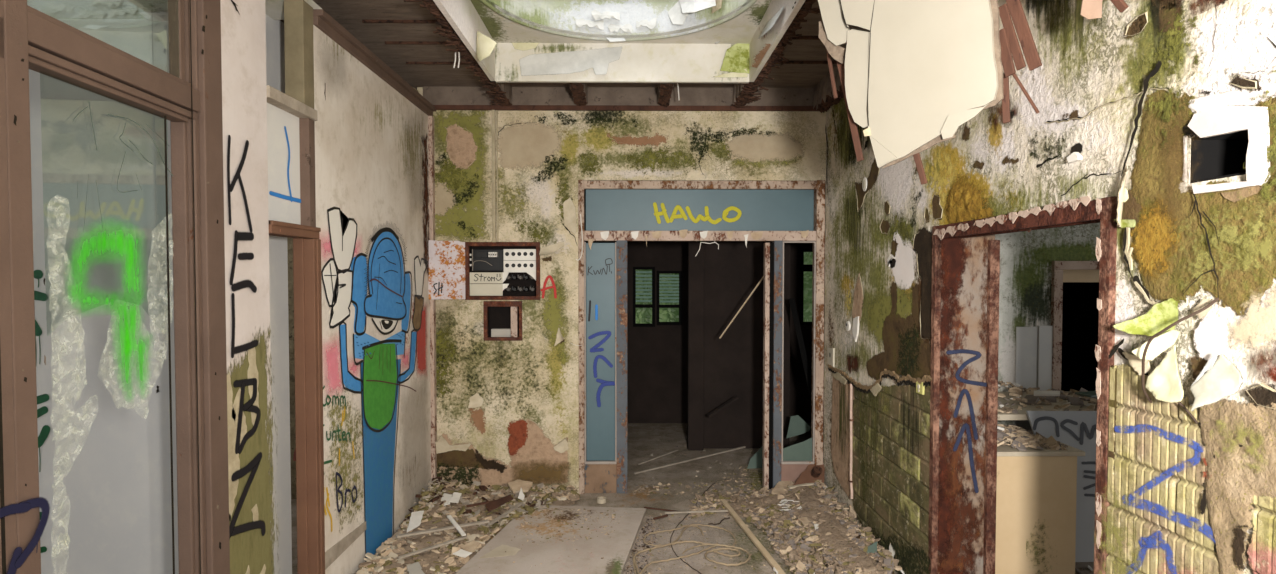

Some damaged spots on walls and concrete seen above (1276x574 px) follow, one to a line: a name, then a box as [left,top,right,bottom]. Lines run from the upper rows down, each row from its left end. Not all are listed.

damp [530,155,569,184]
damp [534,112,638,128]
peeling [512,0,722,76]
damp [683,123,775,162]
spalling [973,0,1018,133]
damp [1164,121,1189,215]
rust [979,238,988,351]
crack [1123,193,1219,305]
flaking render [1106,83,1276,574]
flaking render [435,393,569,493]
flaking render [828,364,932,574]
rust [936,237,986,574]